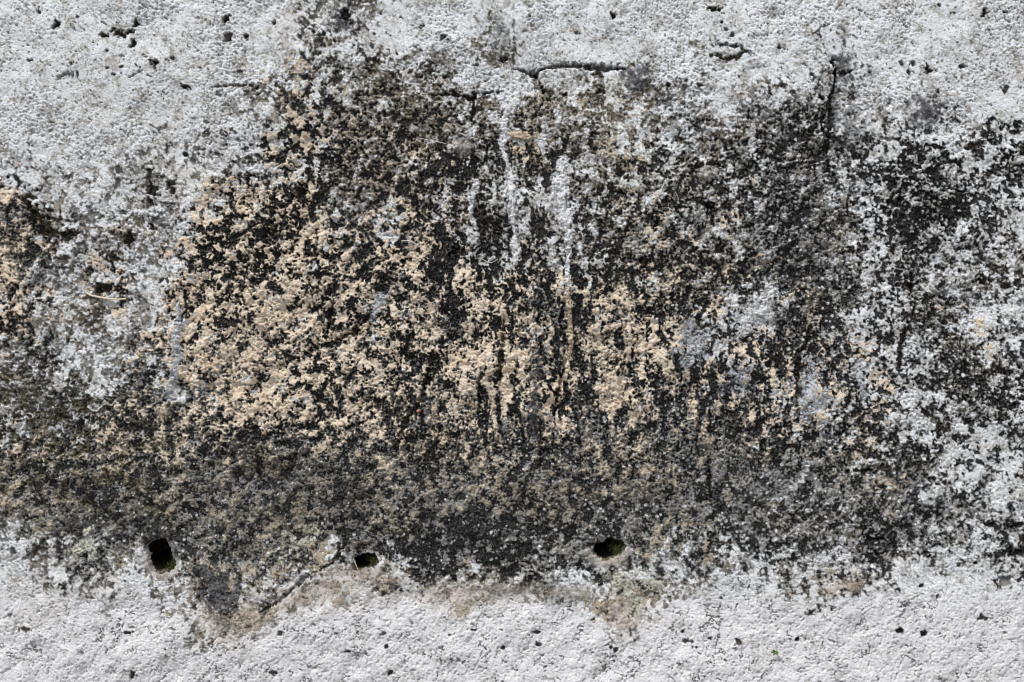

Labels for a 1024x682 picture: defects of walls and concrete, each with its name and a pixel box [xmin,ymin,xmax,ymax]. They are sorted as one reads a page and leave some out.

leakage [470,11,527,84]
crack [513,32,623,94]
crack [819,57,851,172]
leakage [9,161,52,198]
leakage [99,139,180,208]
leakage [181,141,220,180]
leakage [956,129,988,161]
leakage [178,322,203,365]
leakage [195,365,216,384]
leakage [184,616,204,649]
leakage [616,588,647,641]